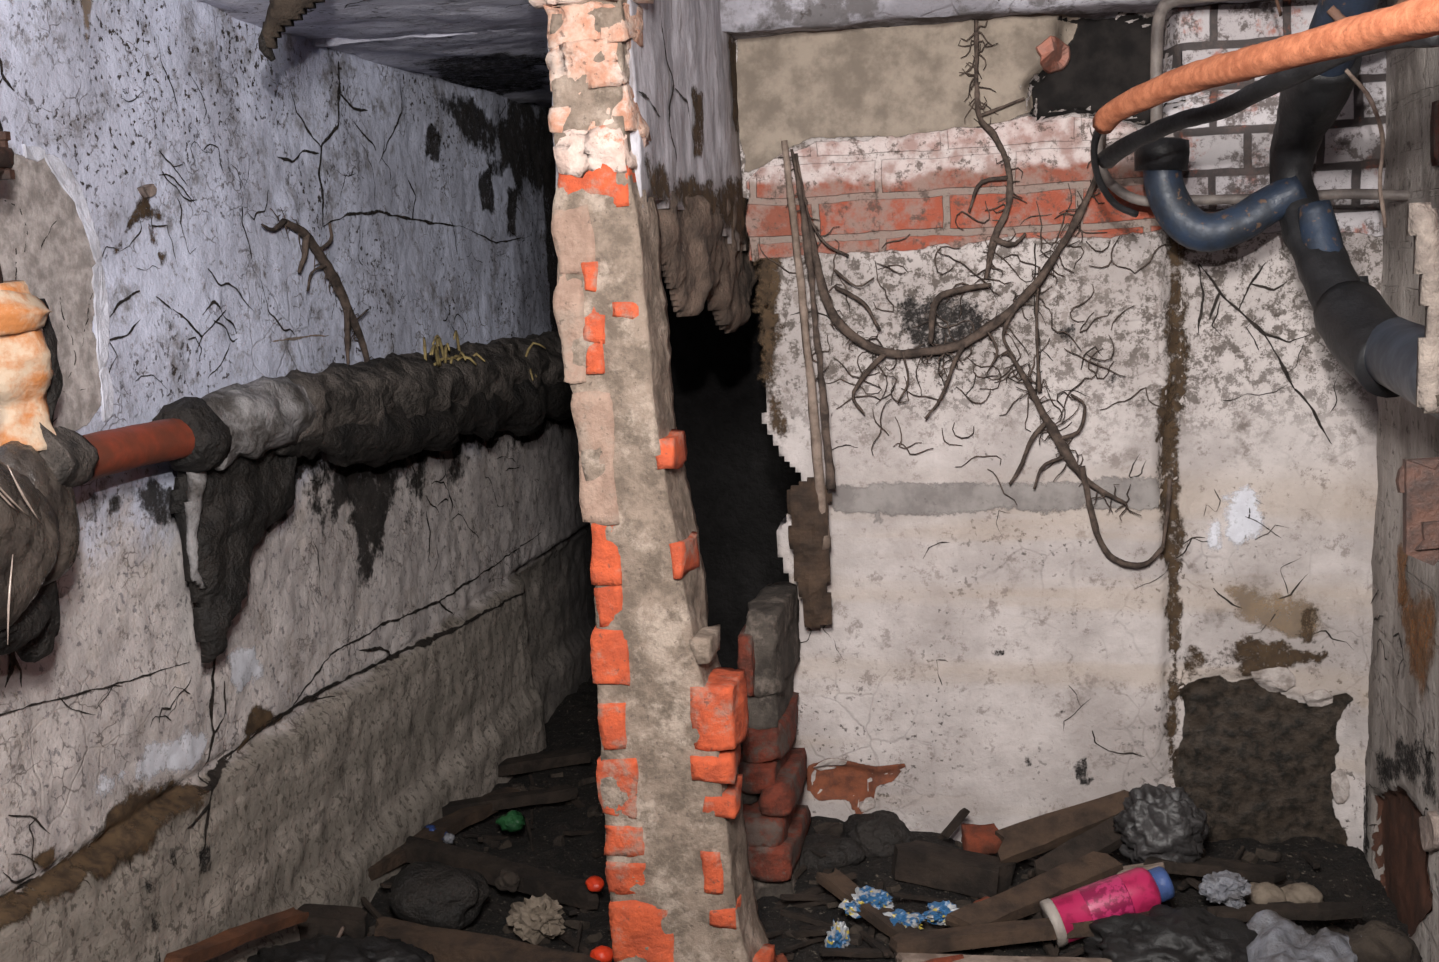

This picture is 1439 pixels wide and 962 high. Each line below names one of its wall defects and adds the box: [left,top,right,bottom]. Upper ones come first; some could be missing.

crack [4,200,57,280]
crack [53,36,529,422]
mould [414,51,558,332]
flaking render [736,0,1319,261]
peeling [1311,51,1387,236]
leakage [1155,383,1180,481]
leakage [1181,337,1191,371]
efflorescence [1207,486,1263,549]
crack [0,432,558,867]
leakage [1172,607,1369,861]
crack [0,815,50,897]